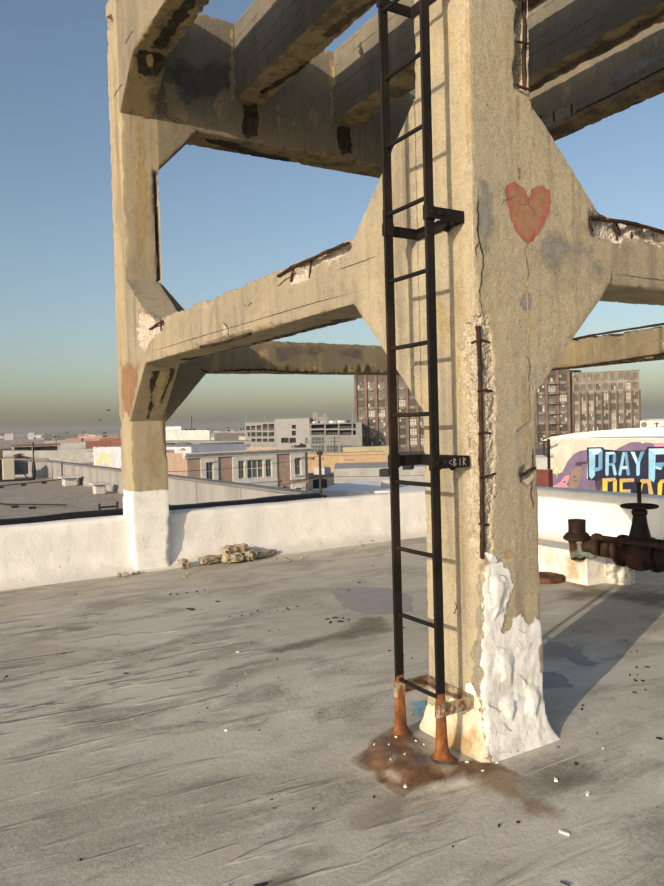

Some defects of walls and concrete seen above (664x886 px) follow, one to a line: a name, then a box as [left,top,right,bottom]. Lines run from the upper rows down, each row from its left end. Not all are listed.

spalling [512,0,531,92]
spalling [277,240,354,286]
crack [475,189,484,308]
spalling [588,209,664,248]
spalling [136,309,165,352]
peeling [154,371,167,410]
peeling [418,311,560,763]
rust [359,727,517,795]